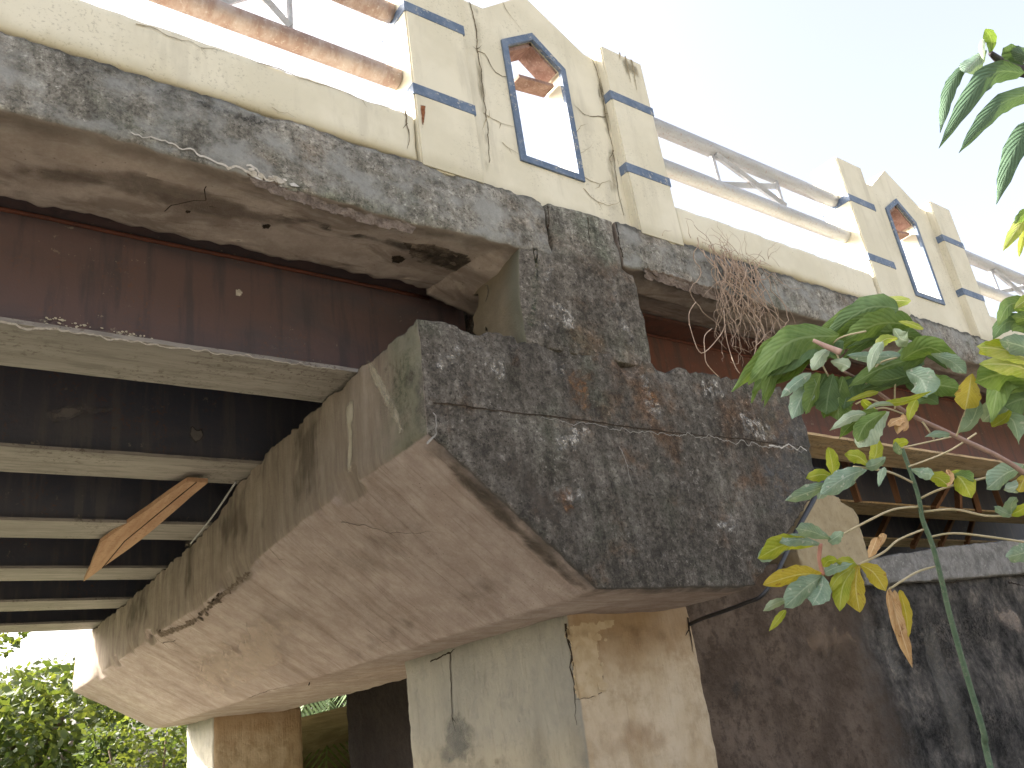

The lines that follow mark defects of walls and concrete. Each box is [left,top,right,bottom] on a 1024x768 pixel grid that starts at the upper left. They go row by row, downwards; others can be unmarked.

crack [469,2,518,163]
water stain [619,52,637,89]
water stain [42,170,243,216]
water stain [131,132,274,182]
spalling [247,168,471,271]
crack [577,62,624,259]
water stain [427,253,471,271]
crack [433,402,808,487]
crack [430,649,456,732]
crack [564,623,602,725]
peeling [565,620,614,699]